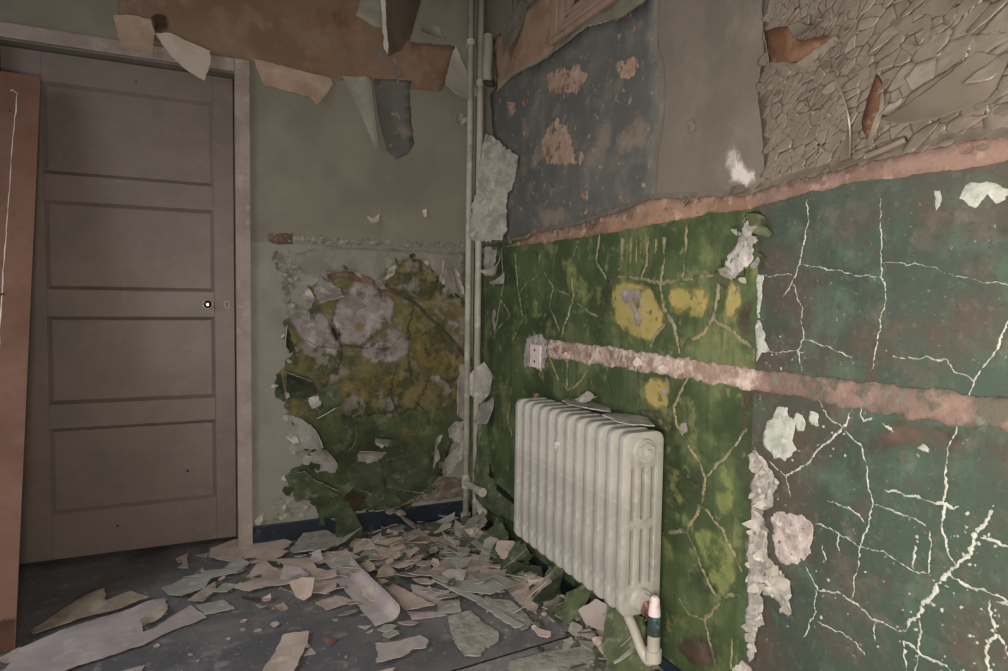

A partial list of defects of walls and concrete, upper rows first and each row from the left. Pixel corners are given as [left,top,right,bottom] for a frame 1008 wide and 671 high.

peeling [113,0,1008,433]
water stain [293,282,449,391]
flaking render [255,233,494,563]
crack [489,386,514,504]
water stain [645,378,669,409]
water stain [612,282,709,340]
water stain [726,281,751,333]
crack [494,198,1008,671]
flaking render [732,407,845,671]